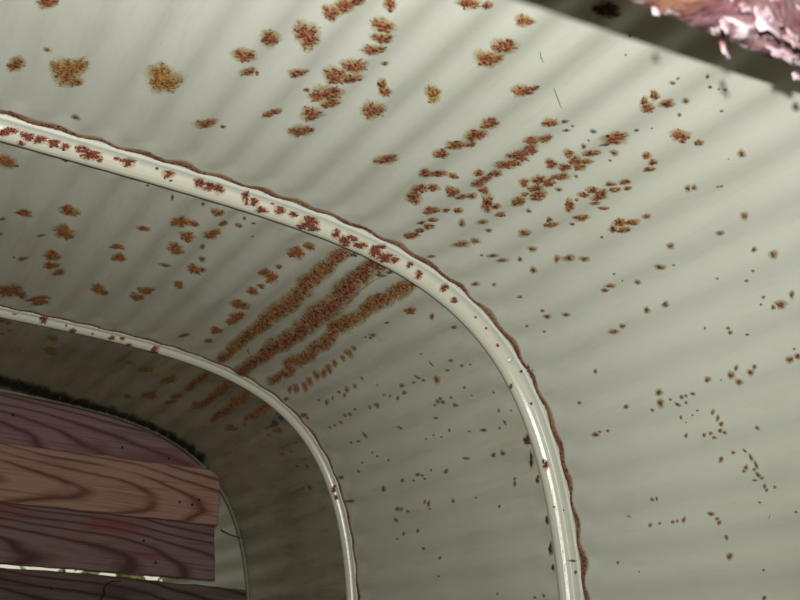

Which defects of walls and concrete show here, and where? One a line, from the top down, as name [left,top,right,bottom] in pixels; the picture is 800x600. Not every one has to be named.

corrosion [44,48,88,87]
corrosion [145,62,183,94]
corrosion [233,45,259,77]
corrosion [260,29,279,47]
corrosion [287,0,396,137]
corrosion [425,85,442,104]
peeling [719,18,731,59]
peeling [739,1,800,80]
corrosion [512,131,628,213]
corrosion [564,179,631,226]
corrosion [600,214,650,238]
corrosion [0,110,590,600]